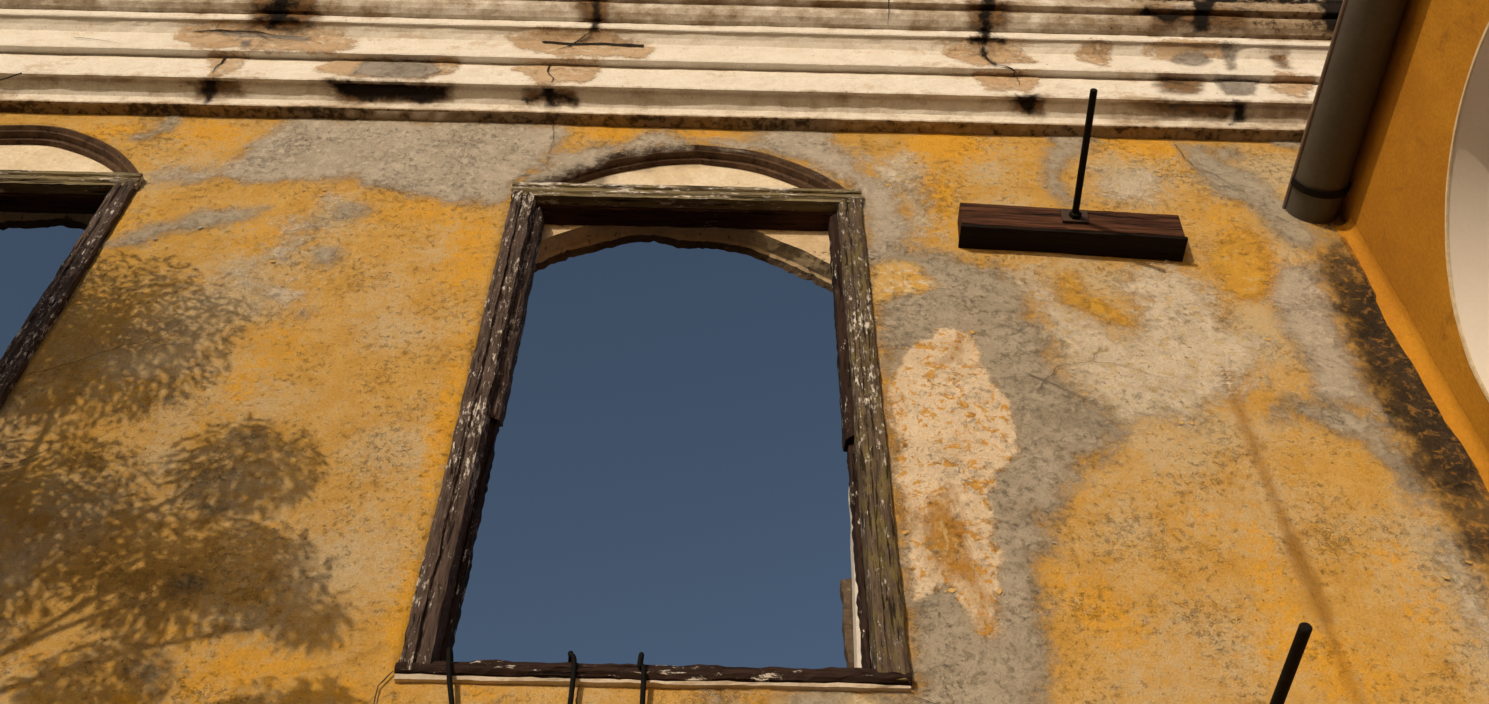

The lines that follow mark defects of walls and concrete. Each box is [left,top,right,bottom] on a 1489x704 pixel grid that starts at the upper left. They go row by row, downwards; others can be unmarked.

water stain [328,80,449,103]
water stain [577,0,608,40]
water stain [965,0,1011,64]
water stain [1140,0,1259,125]
water stain [1269,54,1290,68]
peeling [860,153,945,236]
peeling [1098,166,1161,203]
peeling [1006,261,1273,426]
water stain [1320,240,1489,560]
flaking render [886,328,1020,638]
flaking render [730,691,888,704]